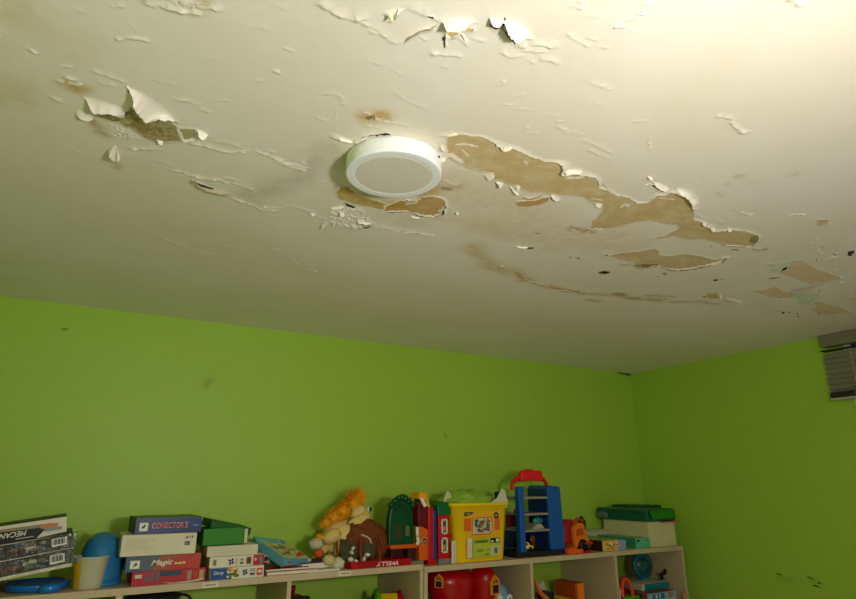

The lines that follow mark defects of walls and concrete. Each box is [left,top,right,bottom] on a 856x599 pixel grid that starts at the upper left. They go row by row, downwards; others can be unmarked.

peeling [311,0,564,70]
peeling [76,86,208,162]
peeling [328,110,411,145]
peeling [167,159,459,233]
peeling [431,129,768,277]
peeling [751,259,852,315]